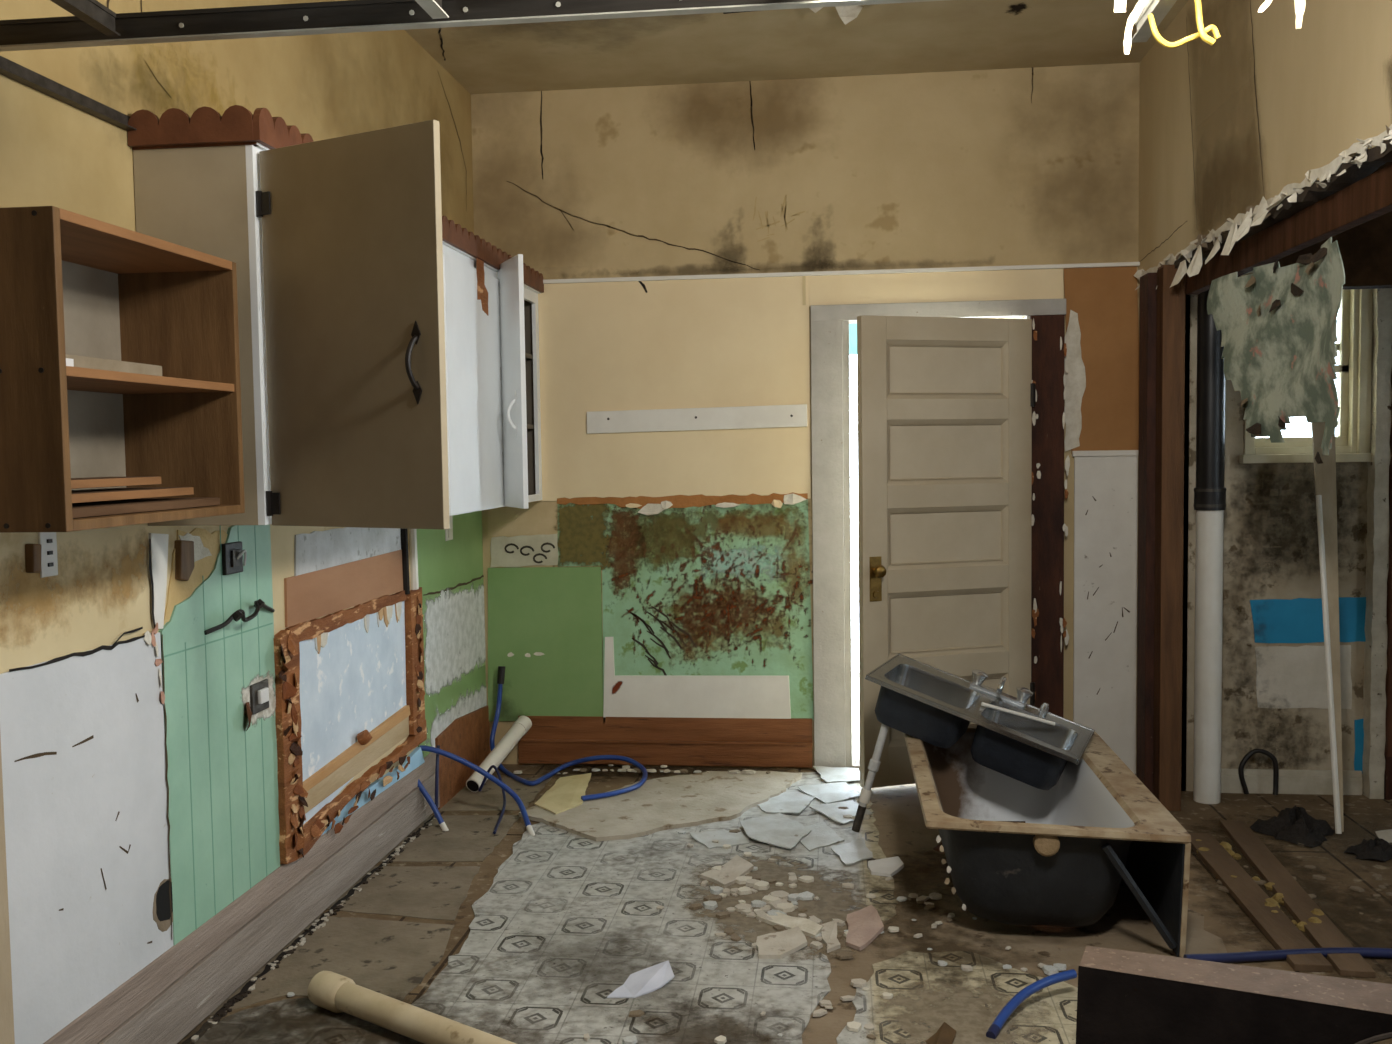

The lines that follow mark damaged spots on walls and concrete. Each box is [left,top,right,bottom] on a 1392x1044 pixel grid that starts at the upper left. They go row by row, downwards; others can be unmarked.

peeling [835,5,863,25]
crack [506,82,759,270]
spalling [1134,124,1392,290]
leakage [0,544,147,635]
peeling [241,630,410,857]
peeling [364,585,487,747]
leakage [1233,464,1320,573]
leakage [1336,463,1362,567]